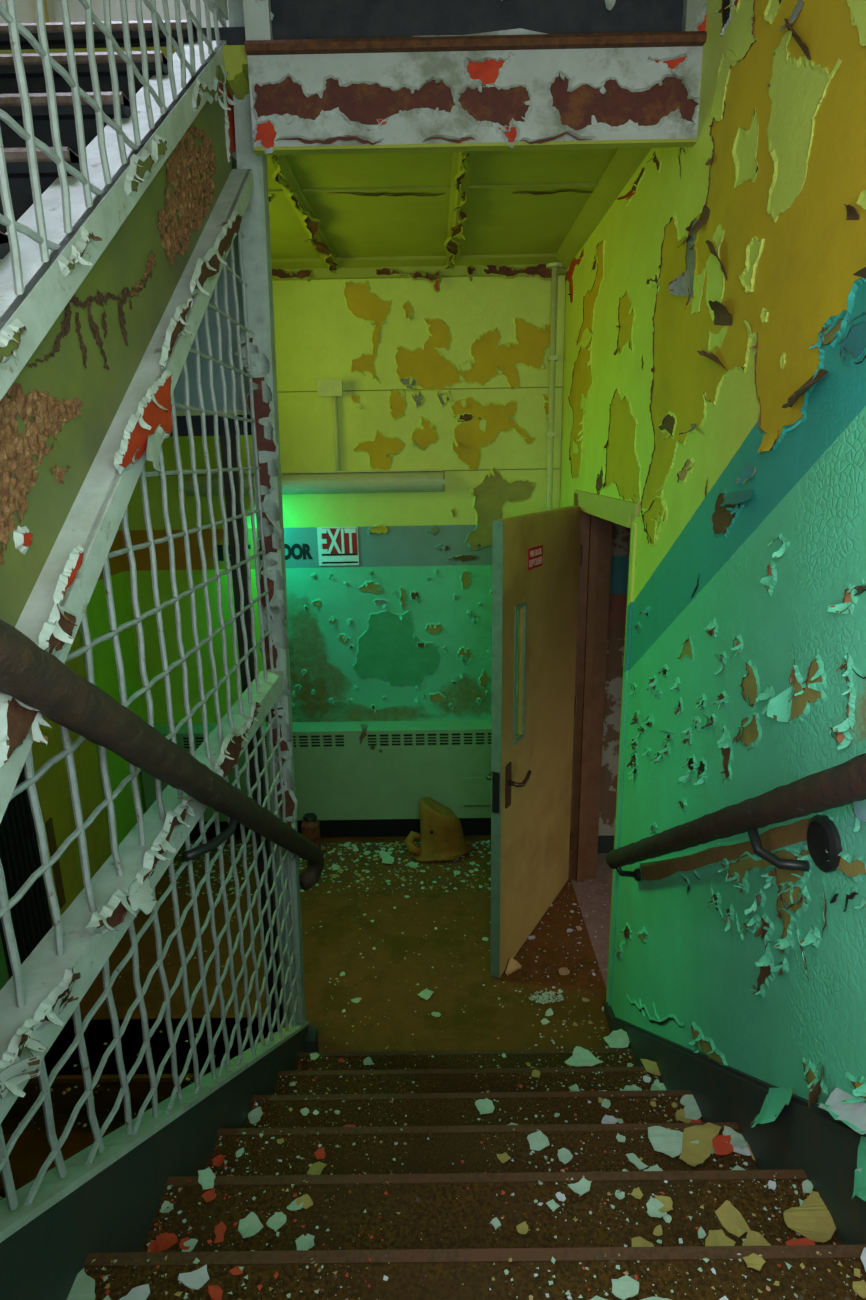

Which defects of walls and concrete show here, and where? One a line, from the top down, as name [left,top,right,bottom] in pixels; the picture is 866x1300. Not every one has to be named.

peeling [192,0,866,547]
peeling [114,370,173,476]
peeling [342,280,550,621]
peeling [215,330,492,829]
peeling [627,618,856,785]
peeling [86,795,195,935]
peeling [640,812,866,999]
peeling [0,966,81,1099]
peeling [564,1029,866,1201]
peeling [178,1264,223,1300]
peeling [214,1194,313,1243]
peeling [615,1187,673,1247]